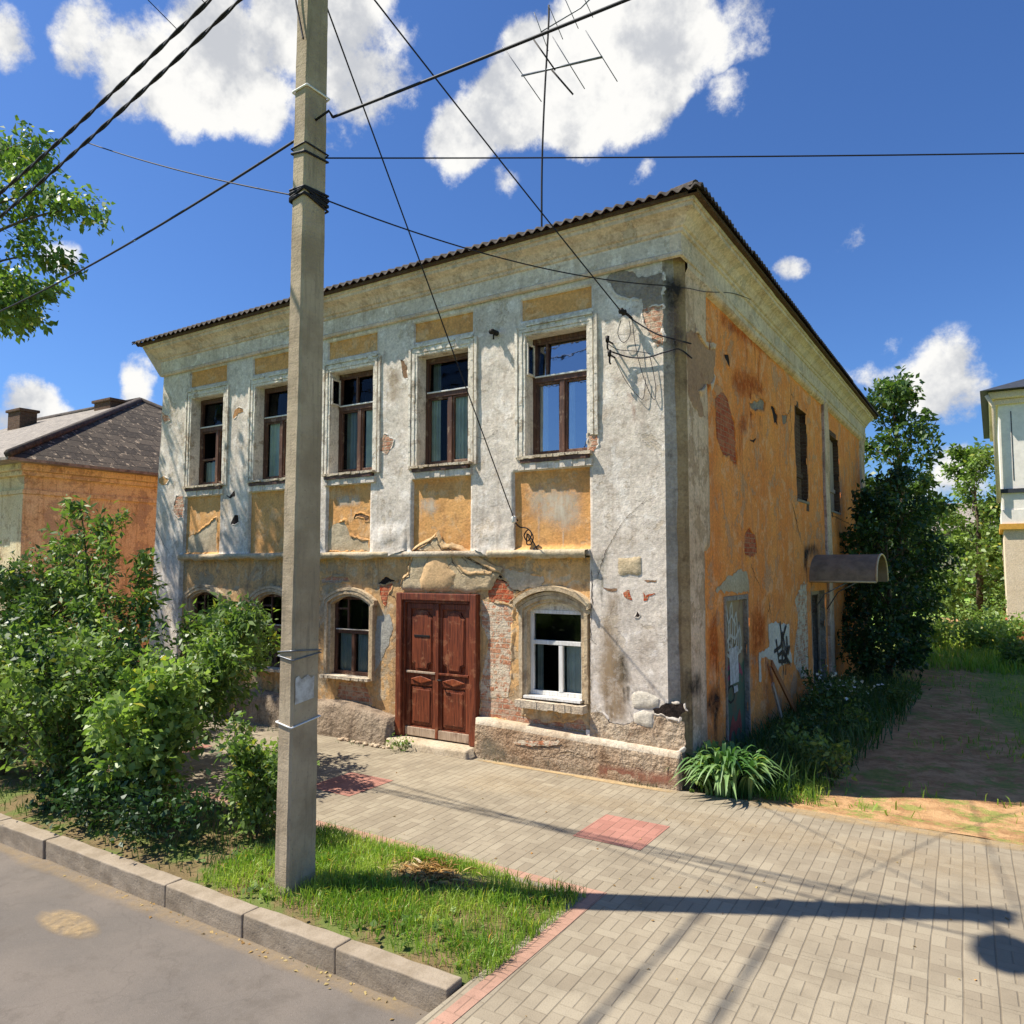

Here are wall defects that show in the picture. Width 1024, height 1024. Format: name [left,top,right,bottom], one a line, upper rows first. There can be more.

flaking render [606,268,666,348]
water stain [666,278,683,347]
flaking render [686,328,738,472]
flaking render [380,432,395,456]
flaking render [186,514,240,553]
flaking render [327,511,370,552]
flaking render [742,523,758,564]
flaking render [375,536,688,753]